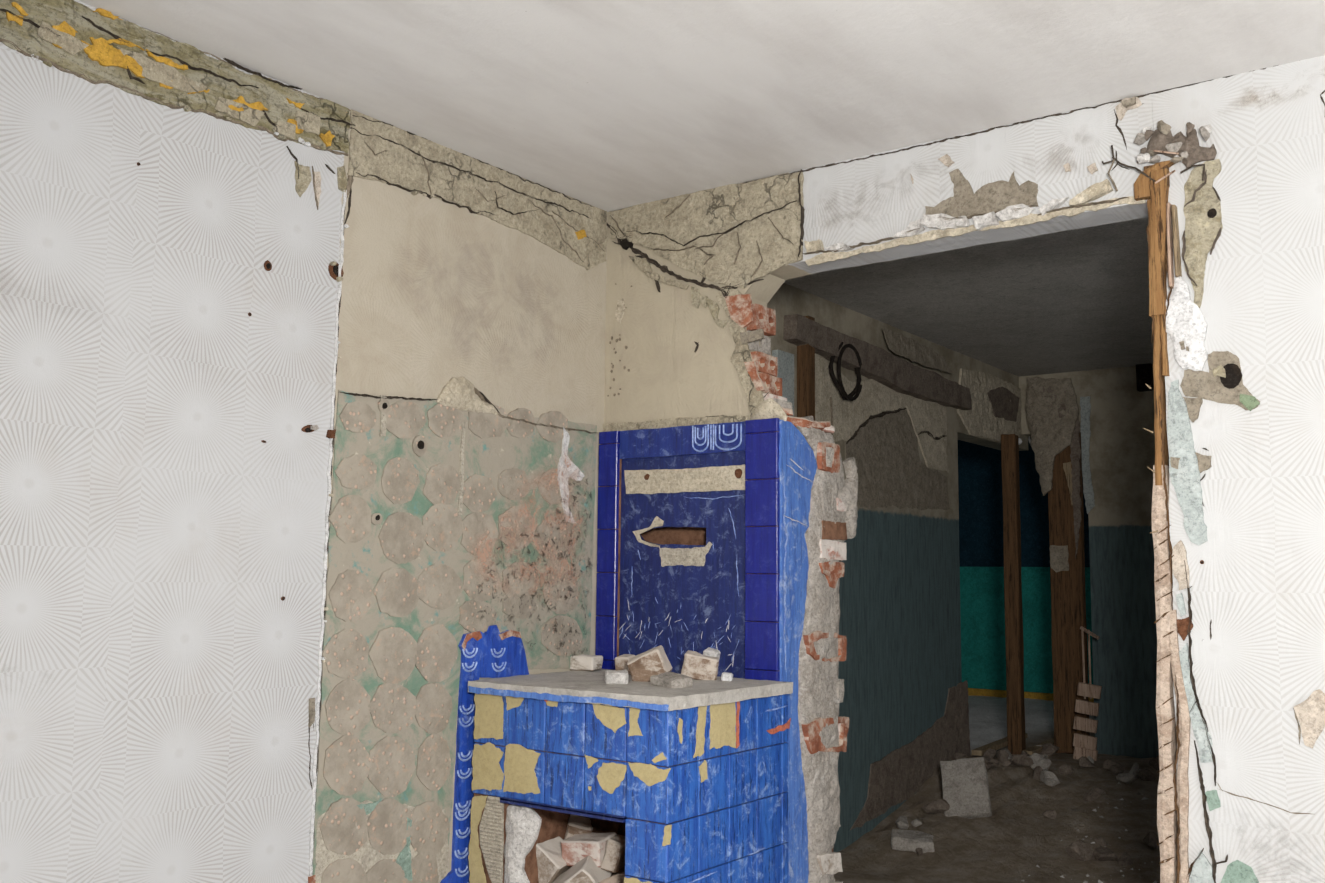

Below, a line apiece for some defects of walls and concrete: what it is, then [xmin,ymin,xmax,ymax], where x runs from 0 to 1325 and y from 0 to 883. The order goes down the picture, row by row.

crack [122,18,259,76]
peeling [1115,96,1142,121]
crack [290,65,1278,353]
peeling [802,120,1223,321]
peeling [0,0,751,883]
spalling [957,369,1025,441]
peeling [1153,338,1260,883]
spalling [801,631,849,754]
spalling [850,680,971,830]
peeling [1293,689,1325,748]
spalling [817,852,843,883]